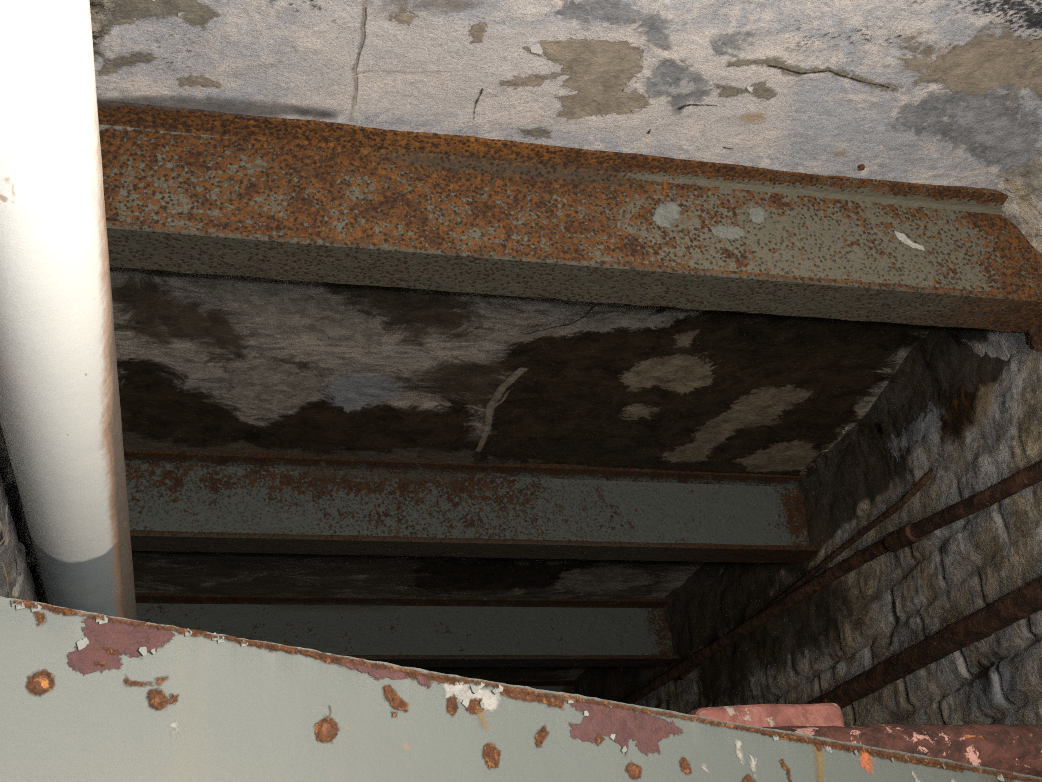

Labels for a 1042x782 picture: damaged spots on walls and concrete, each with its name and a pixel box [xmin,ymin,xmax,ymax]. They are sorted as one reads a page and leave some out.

crack [352,2,398,114]
crack [726,56,904,92]
mould [792,24,919,54]
mould [950,0,1042,52]
water stain [111,270,247,361]
water stain [324,282,490,351]
water stain [117,307,965,485]
rust [939,387,981,444]
peeling [67,614,175,675]
rust [11,599,1042,782]
peeling [563,699,682,756]